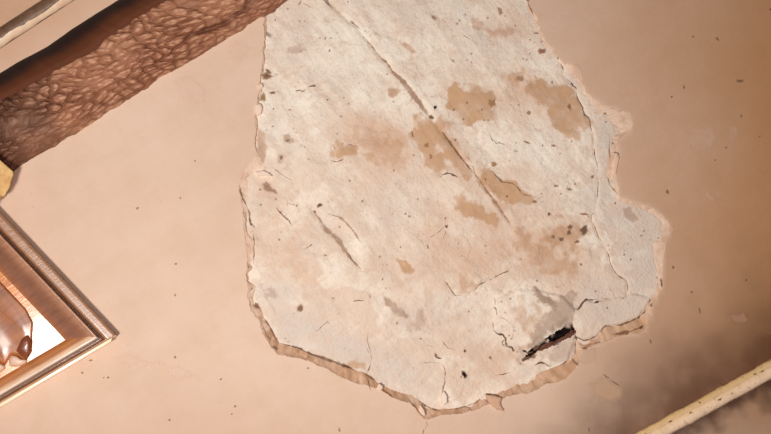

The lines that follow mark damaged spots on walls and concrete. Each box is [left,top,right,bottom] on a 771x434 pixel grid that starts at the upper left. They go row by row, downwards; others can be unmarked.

crack [351,21,429,116]
water stain [446,83,495,126]
water stain [526,79,582,138]
water stain [410,115,469,181]
flaking render [238,0,673,420]
water stain [456,201,498,226]
crack [442,132,536,225]
crack [534,311,645,366]